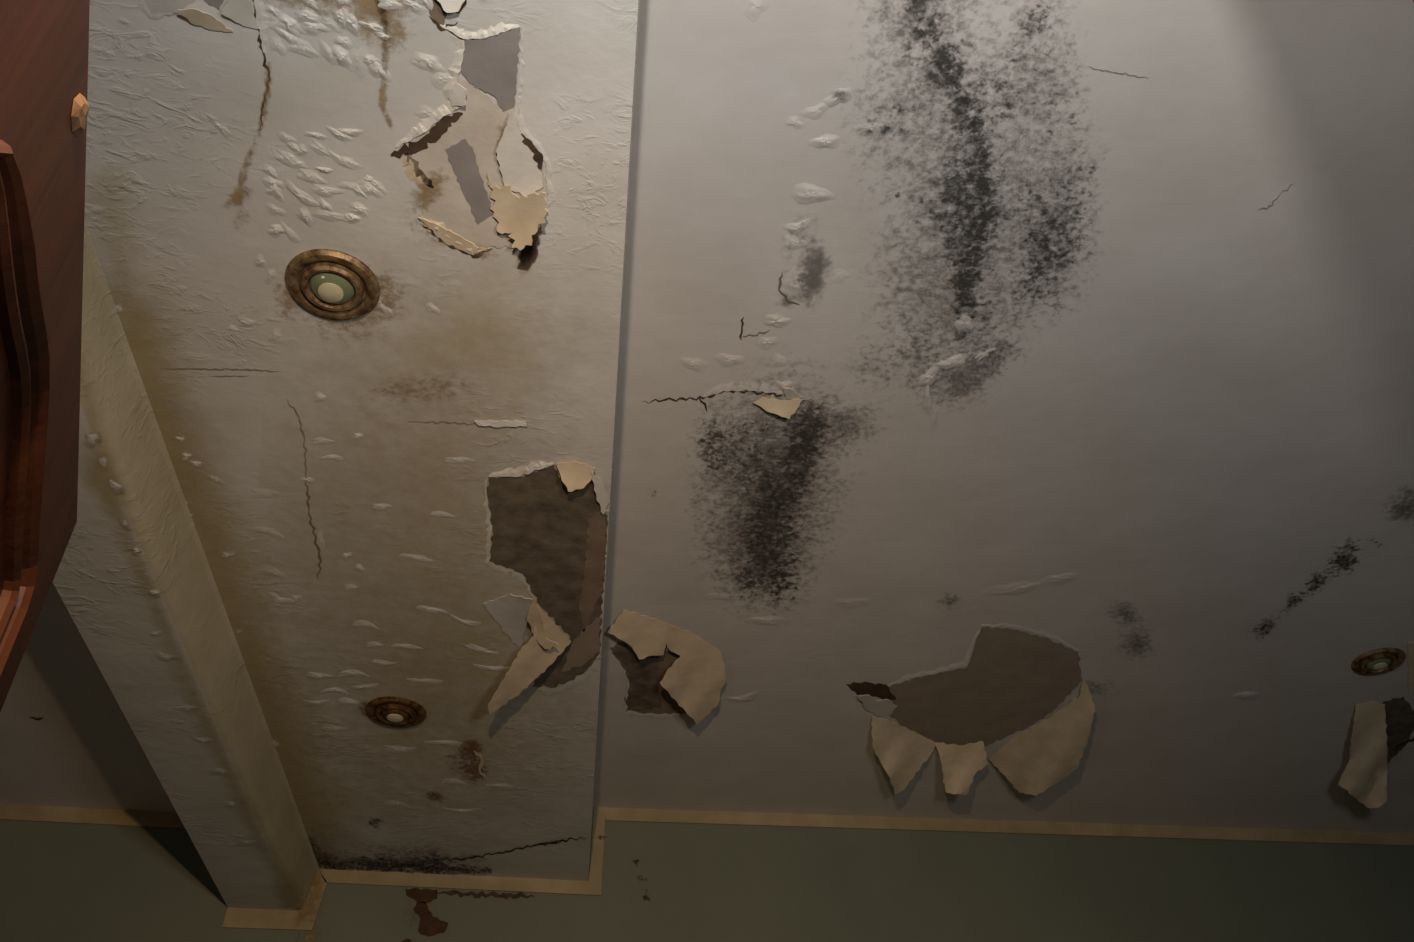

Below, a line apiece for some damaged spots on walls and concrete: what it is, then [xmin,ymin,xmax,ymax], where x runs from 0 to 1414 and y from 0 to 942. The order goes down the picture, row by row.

peeling [391,0,555,270]
damp [868,0,1095,343]
peeling [482,460,726,724]
damp [697,401,855,601]
peeling [847,623,1096,796]
peeling [1338,697,1414,809]